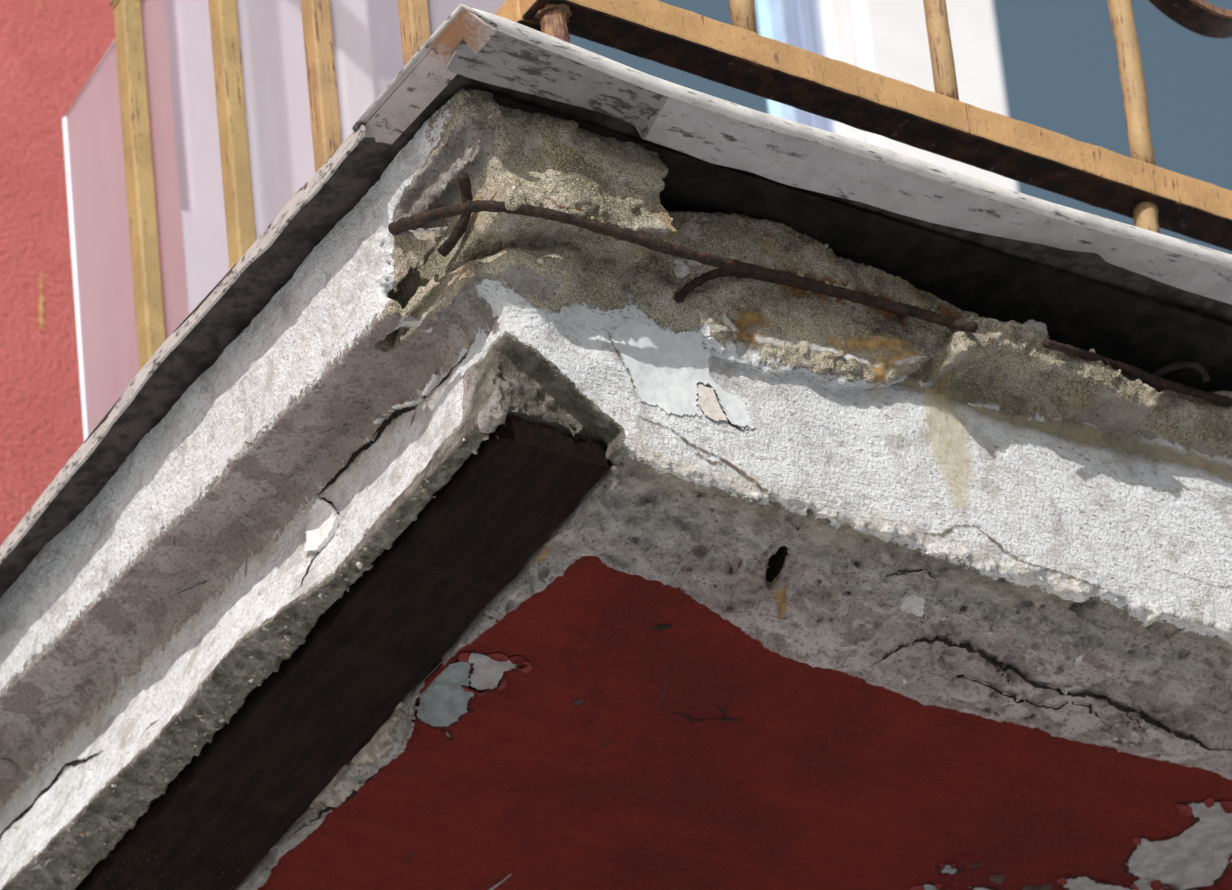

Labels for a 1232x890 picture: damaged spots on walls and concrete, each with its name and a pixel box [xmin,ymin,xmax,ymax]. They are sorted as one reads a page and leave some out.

spalling [331,88,1232,456]
crack [283,340,471,515]
crack [608,332,779,504]
water stain [722,313,869,363]
rust [829,336,915,380]
water stain [889,356,1232,481]
spalling [1,332,625,890]
spalling [502,478,1232,780]
crack [894,524,1122,600]
crack [867,636,1232,751]
crack [0,750,103,838]
peeling [1022,797,1232,890]